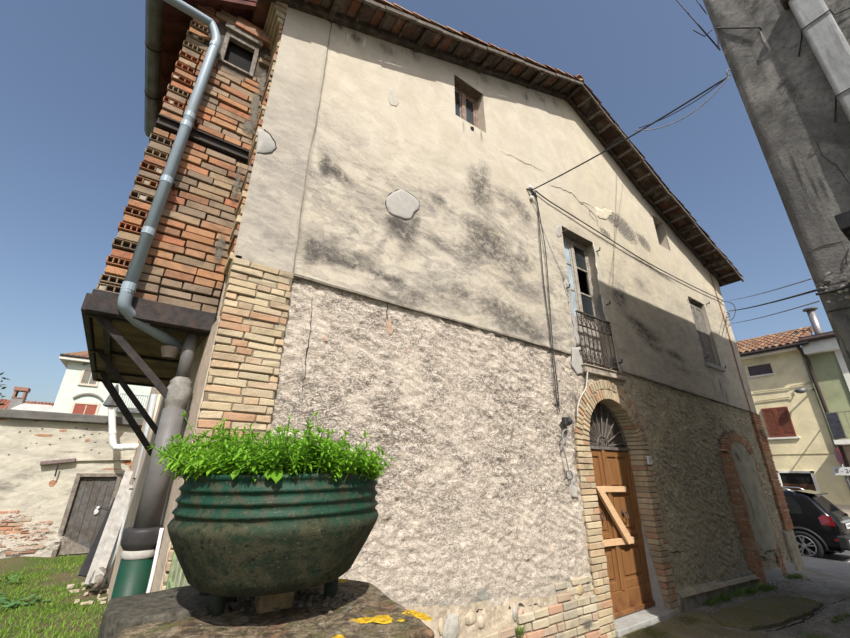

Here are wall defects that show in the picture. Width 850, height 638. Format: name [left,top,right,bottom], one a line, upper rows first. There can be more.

leakage [306,241,397,282]
leakage [389,217,419,242]
leakage [464,225,511,264]
spalling [819,258,850,304]
crack [302,298,313,392]
peeling [830,314,850,370]
spalling [0,510,53,555]